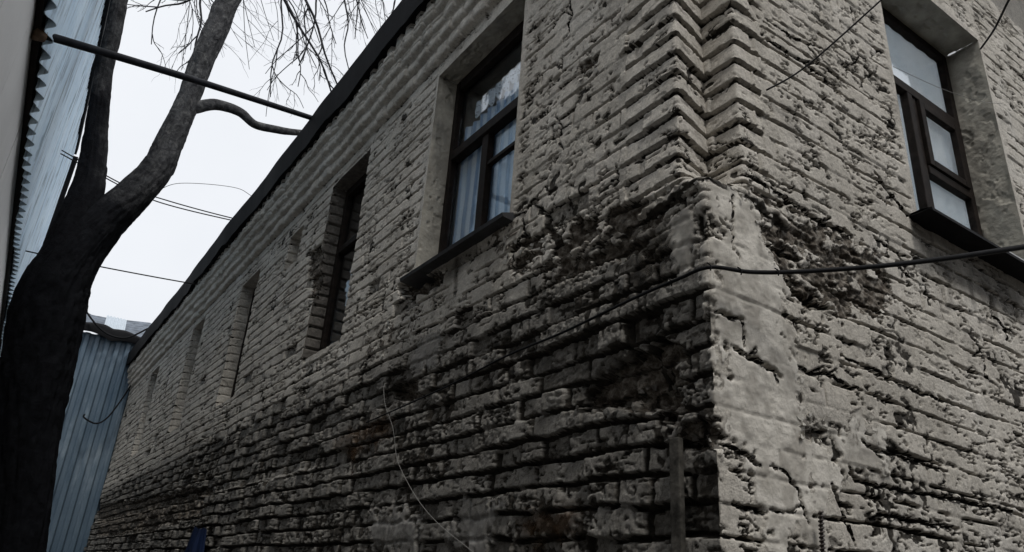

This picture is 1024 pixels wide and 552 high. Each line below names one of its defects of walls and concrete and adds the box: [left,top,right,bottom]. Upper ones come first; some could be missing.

crack [566,0,574,32]
spalling [749,187,895,327]